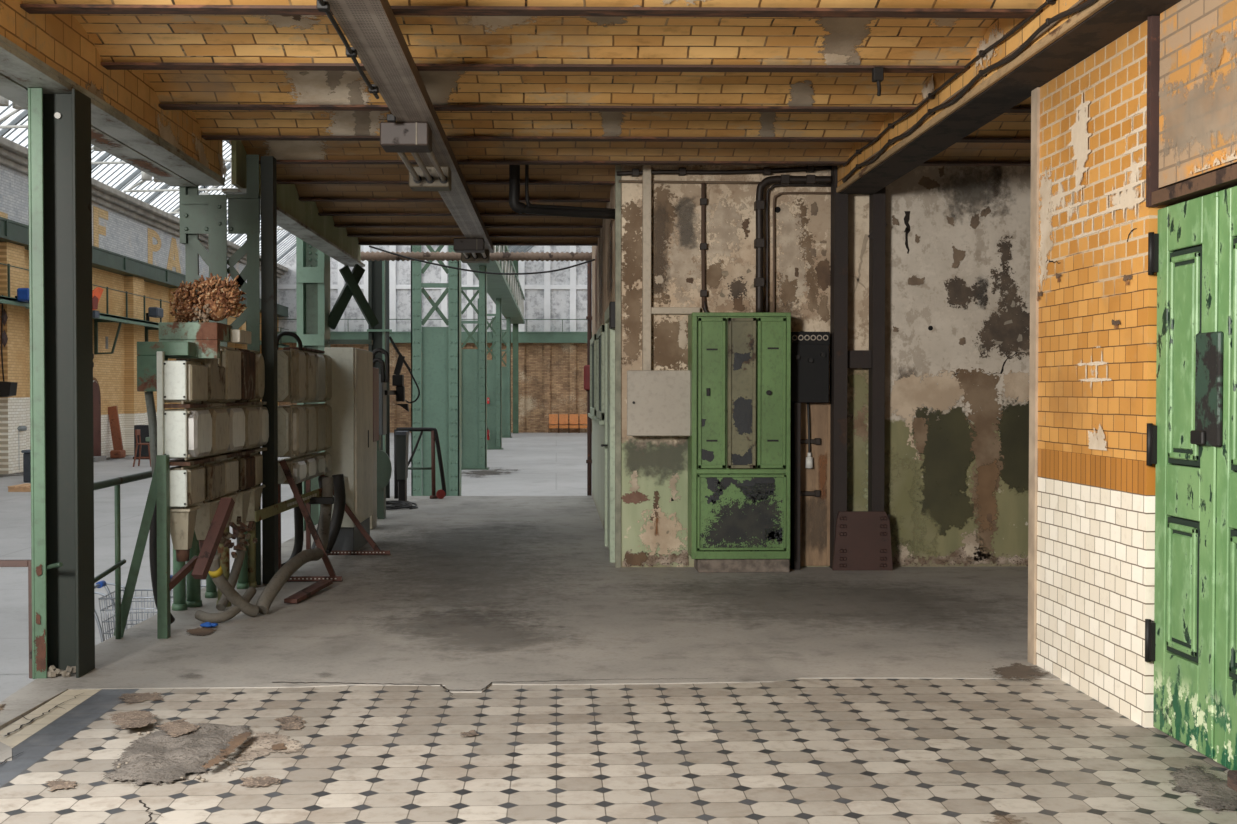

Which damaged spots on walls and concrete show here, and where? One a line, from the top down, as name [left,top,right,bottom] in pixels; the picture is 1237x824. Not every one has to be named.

peeling [810,17,877,65]
spalling [918,166,944,190]
spalling [970,207,991,229]
peeling [621,165,796,370]
peeling [885,235,1042,566]
crack [139,800,161,824]